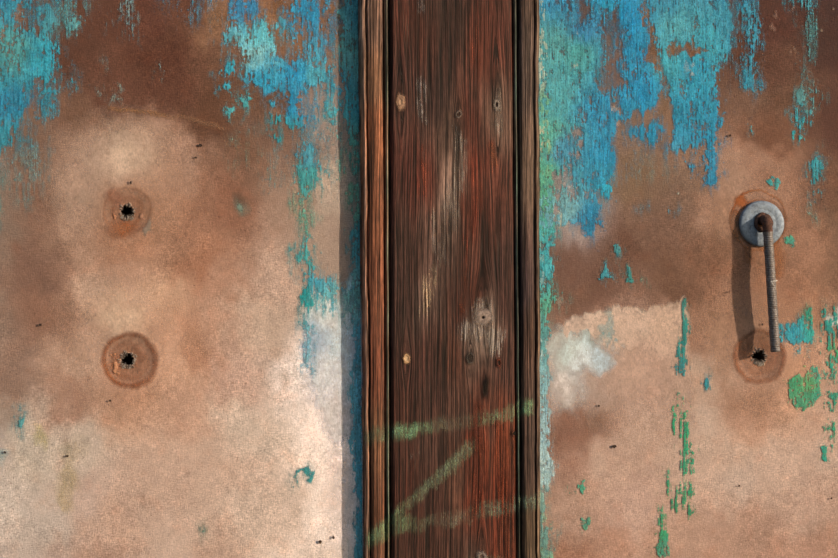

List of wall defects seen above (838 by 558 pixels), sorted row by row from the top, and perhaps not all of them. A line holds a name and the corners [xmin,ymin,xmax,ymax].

peeling [0,0,86,180]
peeling [218,0,363,558]
peeling [539,0,763,558]
corrosion [729,189,787,251]
peeling [790,0,818,63]
peeling [792,78,823,144]
peeling [806,156,824,198]
peeling [779,306,838,462]